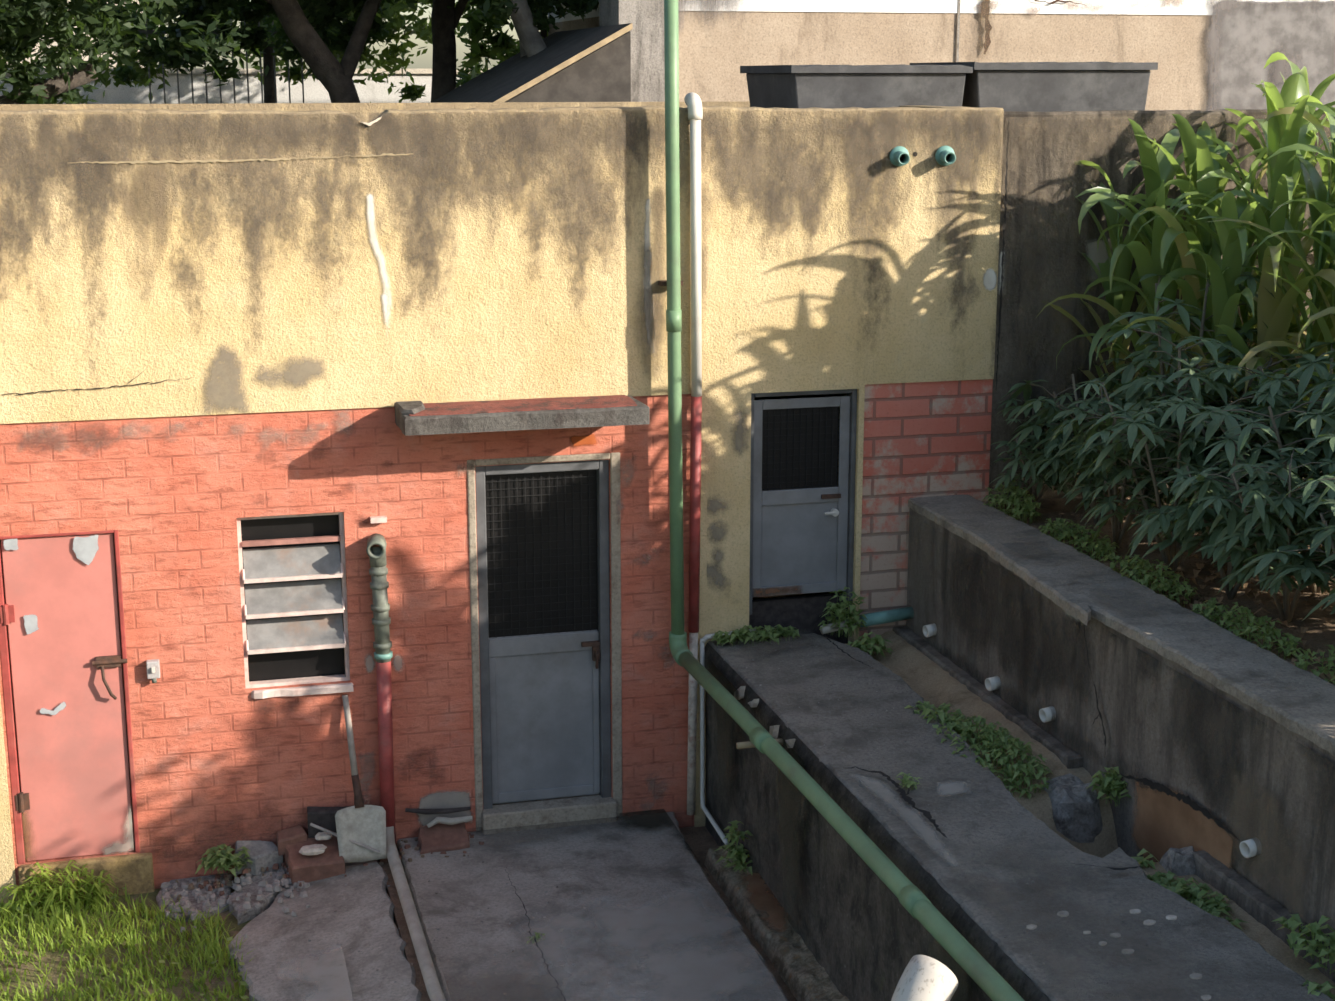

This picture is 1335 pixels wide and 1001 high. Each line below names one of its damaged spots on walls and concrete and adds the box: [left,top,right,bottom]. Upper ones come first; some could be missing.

water stain [678,0,724,23]
crack [981,0,992,54]
crack [1034,0,1087,8]
water stain [1268,49,1299,85]
water stain [702,0,1267,355]
water stain [0,112,664,342]
crack [2,369,196,395]
peeling [4,539,19,550]
peeling [73,535,99,565]
peeling [23,615,39,634]
peeling [105,810,134,854]
crack [505,867,566,1001]